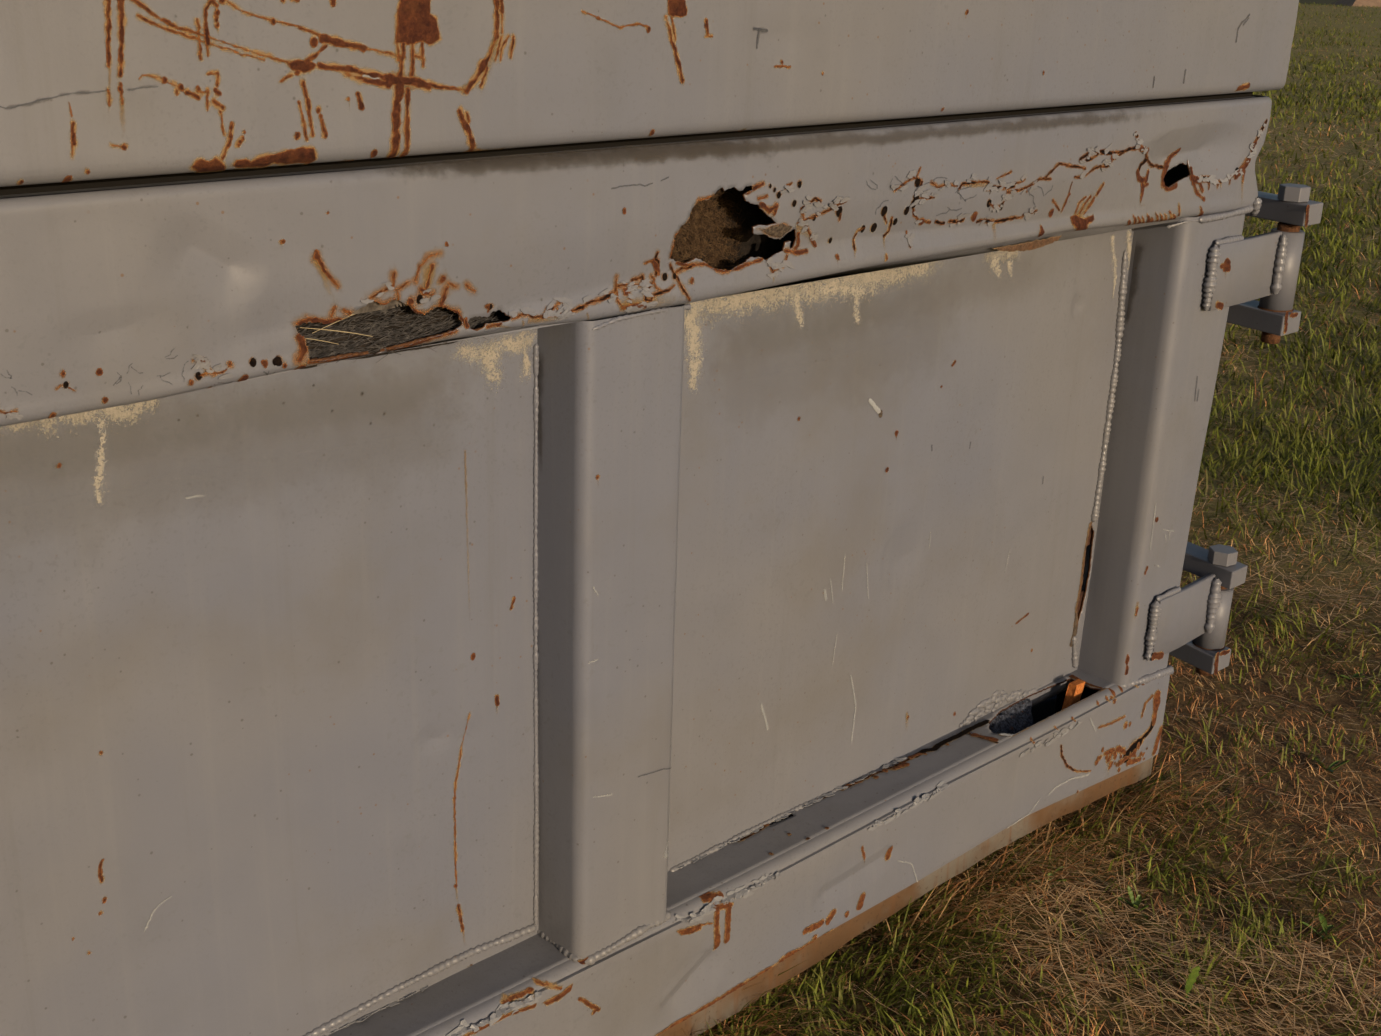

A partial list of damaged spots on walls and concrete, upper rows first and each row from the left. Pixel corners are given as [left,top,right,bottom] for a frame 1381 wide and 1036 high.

corrosion [103,0,516,173]
corrosion [993,181,1105,252]
corrosion [1126,168,1205,226]
peeling [352,282,441,314]
corrosion [1095,654,1163,773]
corrosion [655,891,866,1036]